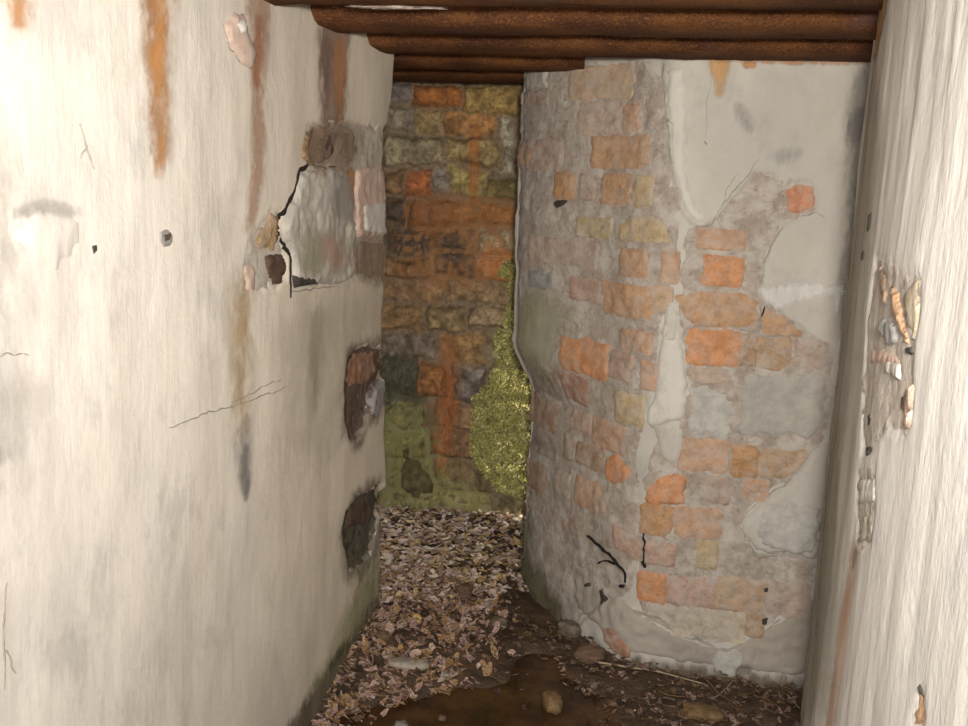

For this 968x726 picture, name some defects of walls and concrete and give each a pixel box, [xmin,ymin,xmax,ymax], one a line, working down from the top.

rust [15,0,24,25]
rust [144,0,168,159]
rust [319,27,350,127]
rust [710,60,851,94]
spalling [243,211,286,293]
spalling [302,123,387,283]
spalling [344,341,385,446]
spalling [517,60,834,678]
spalling [861,258,922,455]
spalling [342,481,381,576]
crack [586,533,646,588]
crack [634,610,780,650]